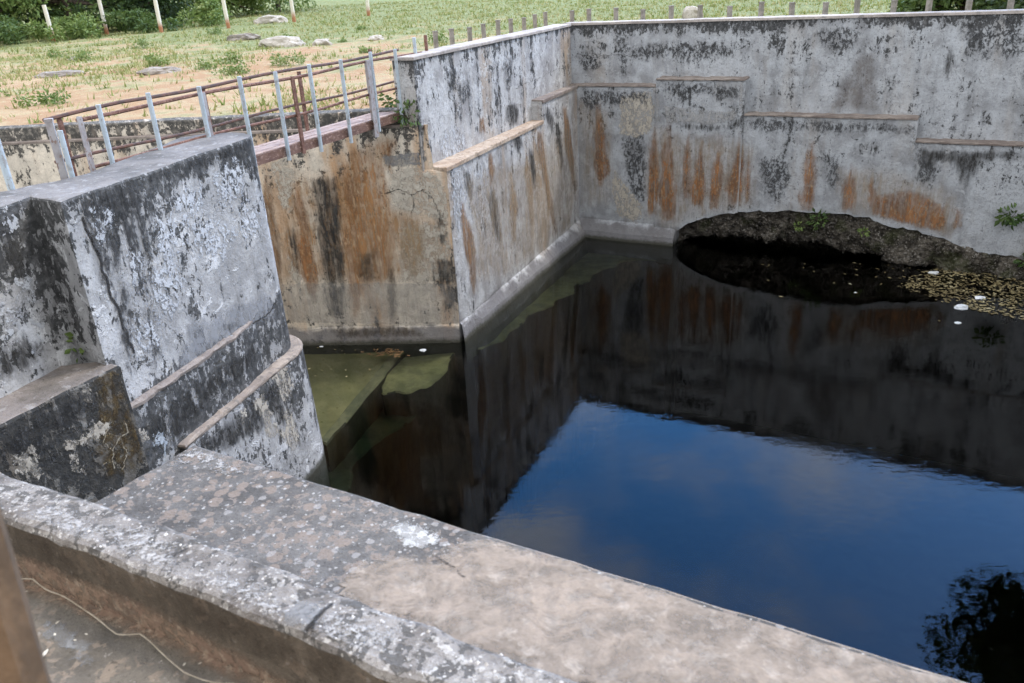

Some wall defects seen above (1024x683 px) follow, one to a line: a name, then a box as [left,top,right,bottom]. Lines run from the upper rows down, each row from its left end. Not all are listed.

rust [264,183,280,277]
rust [294,196,318,293]
leakage [282,182,438,336]
rust [343,141,390,303]
rust [596,122,609,180]
rust [648,144,750,219]
rust [798,152,814,206]
rust [868,184,958,229]